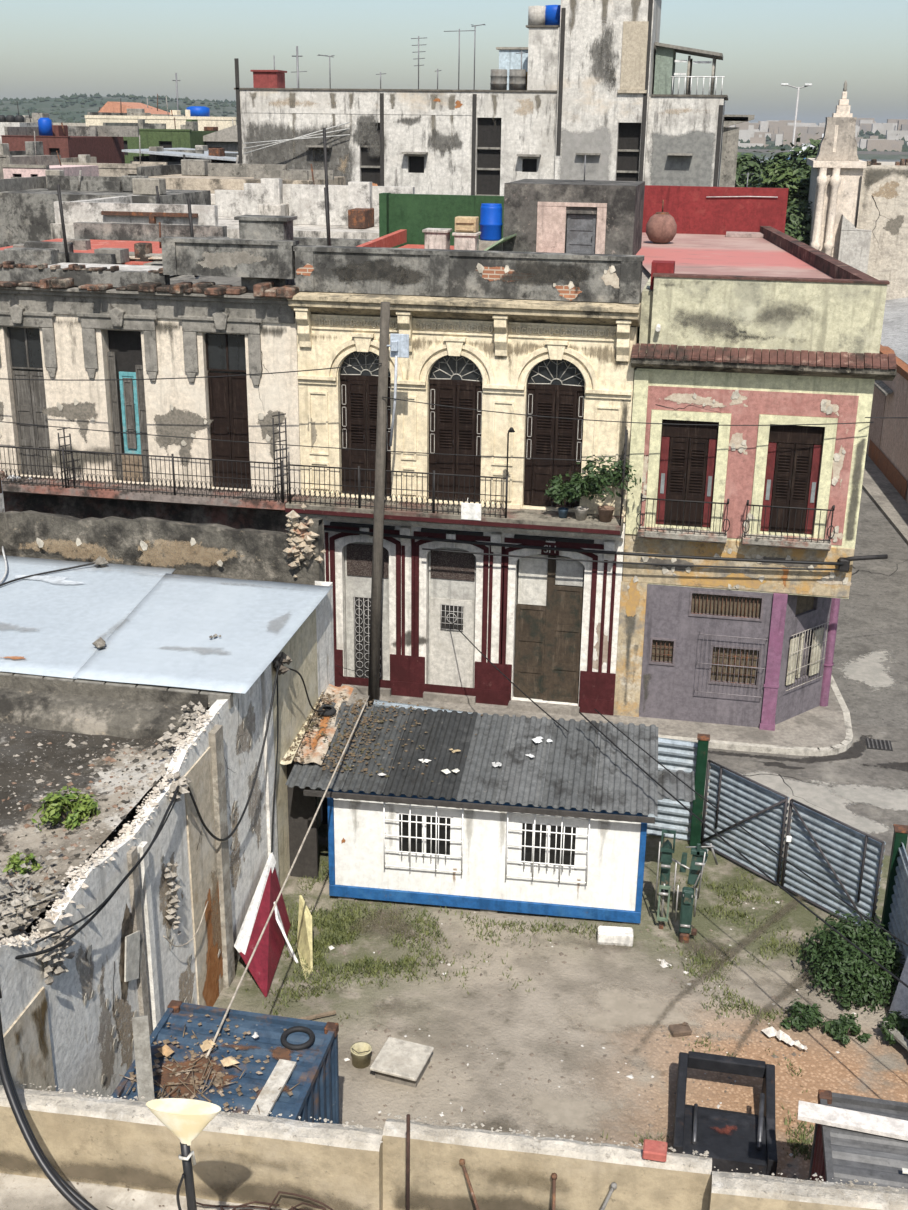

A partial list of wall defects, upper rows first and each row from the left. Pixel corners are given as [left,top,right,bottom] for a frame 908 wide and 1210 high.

leakage [590,0,619,87]
spalling [476,263,515,282]
spalling [553,281,582,301]
leakage [681,312,770,339]
leakage [761,307,807,322]
peeling [659,389,748,408]
corrosion [311,716,330,749]
peeling [159,854,183,947]
corrosion [203,941,220,1007]